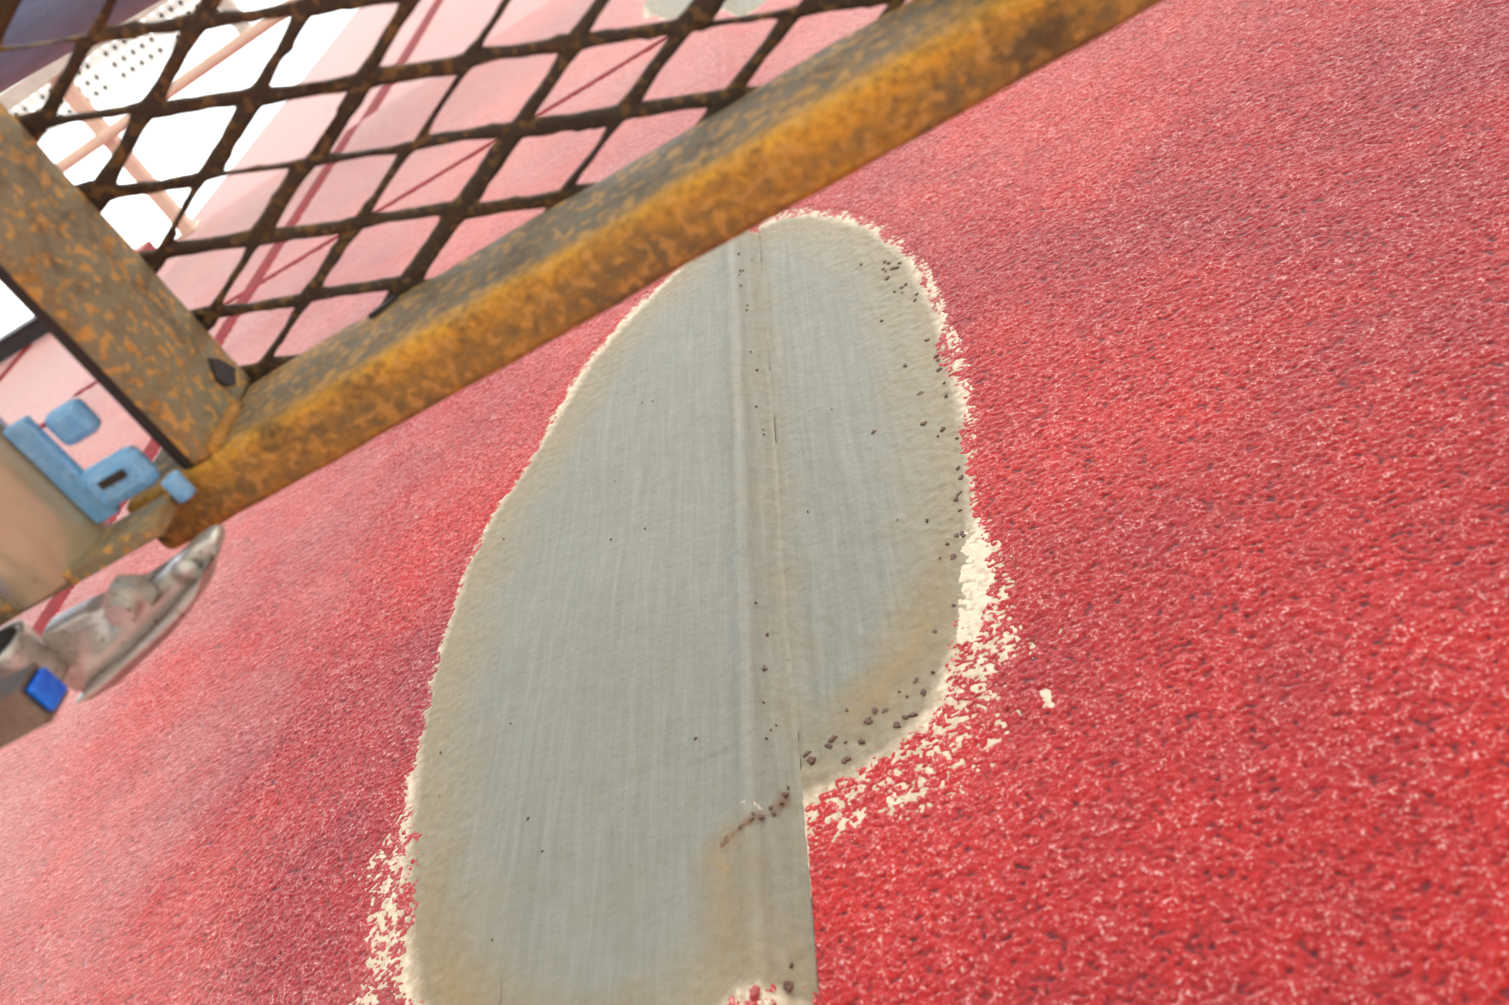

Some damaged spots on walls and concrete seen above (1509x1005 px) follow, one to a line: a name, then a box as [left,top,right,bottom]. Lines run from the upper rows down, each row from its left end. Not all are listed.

peeling [349,207,1036,1005]
peeling [1039,688,1055,708]